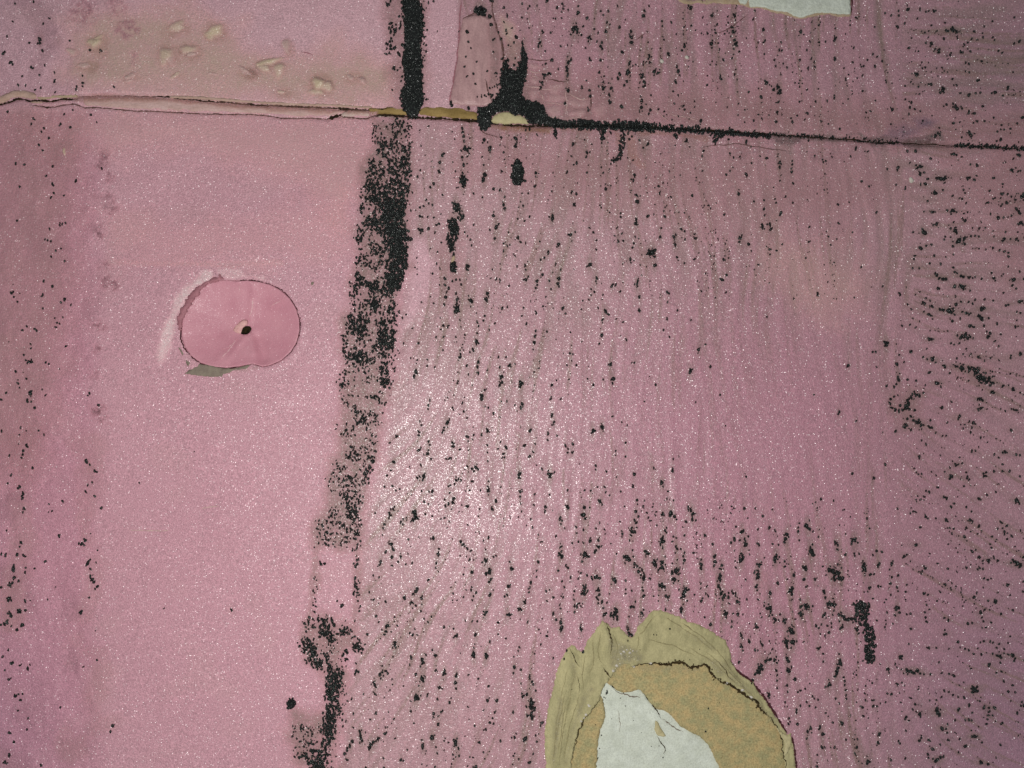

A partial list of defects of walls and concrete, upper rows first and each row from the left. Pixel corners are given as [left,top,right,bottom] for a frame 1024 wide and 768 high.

peeling [679,0,853,19]
crack [0,90,621,137]
crack [648,126,1019,151]
leakage [943,102,1024,180]
peeling [178,347,250,377]
leakage [479,322,557,418]
leakage [533,149,1024,768]
leakage [372,413,558,768]
peeling [544,610,797,768]